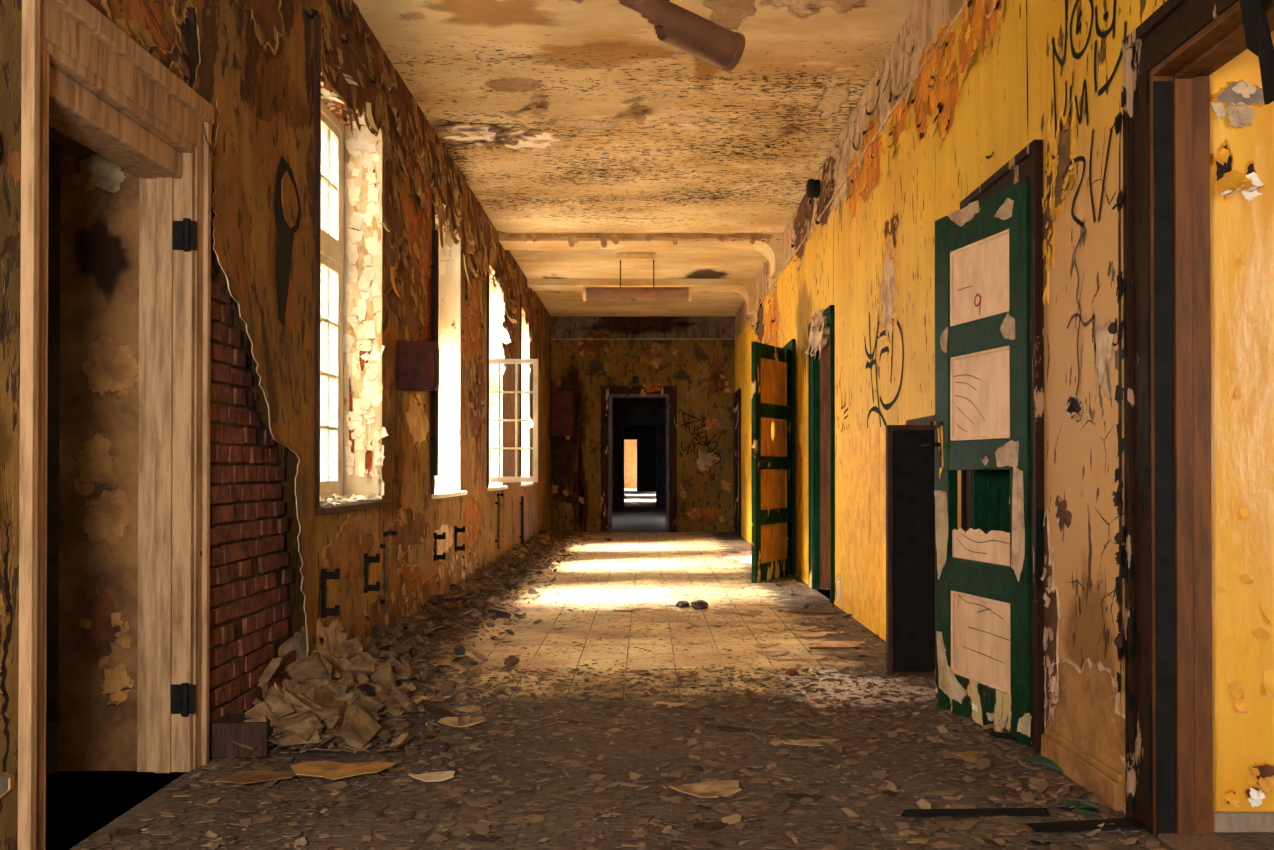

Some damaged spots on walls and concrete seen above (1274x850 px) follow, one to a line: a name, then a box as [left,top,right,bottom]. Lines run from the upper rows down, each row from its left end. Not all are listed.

peeling [87,0,195,78]
peeling [702,0,757,30]
water stain [526,69,849,207]
peeling [791,0,1005,271]
peeling [317,0,566,497]
peeling [200,96,492,723]
peeling [551,436,584,510]
peeling [486,610,511,619]